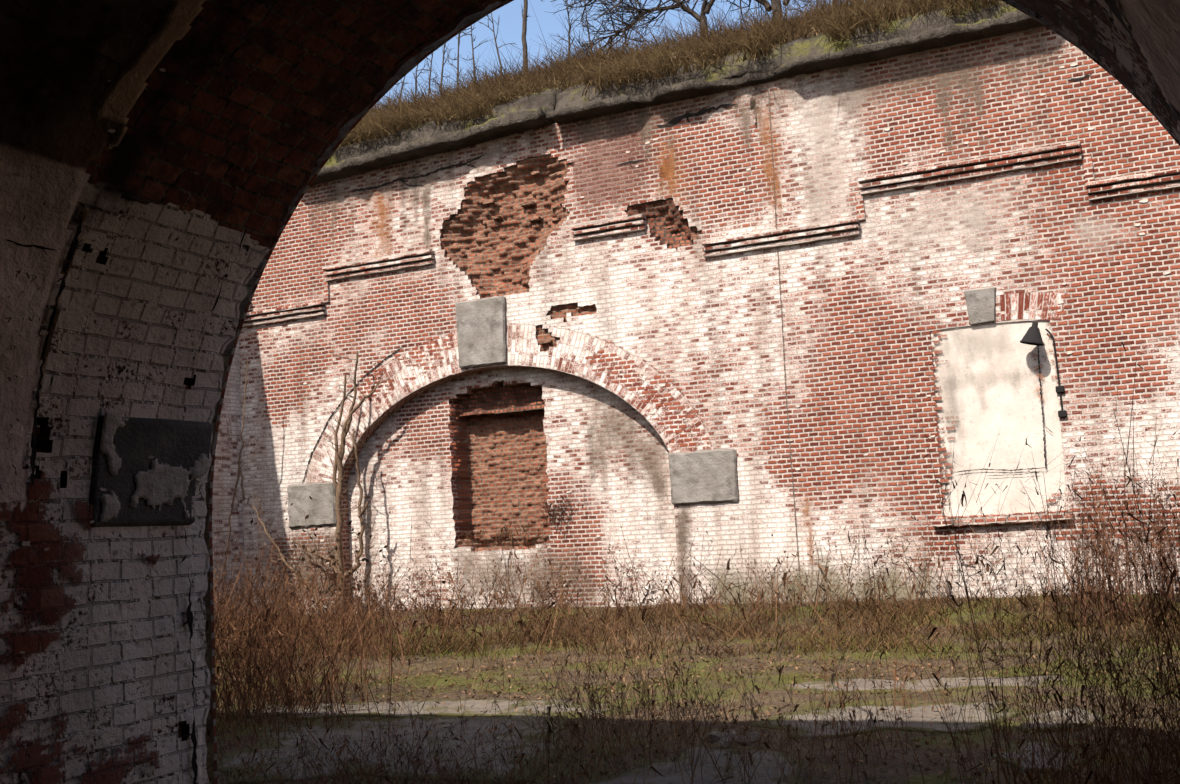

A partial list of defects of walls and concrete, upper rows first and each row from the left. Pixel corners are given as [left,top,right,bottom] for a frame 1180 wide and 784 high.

crack [657,104,737,128]
peeling [0,207,212,680]
spalling [253,97,787,471]
crack [767,87,802,601]
peeling [759,270,970,564]
peeling [0,698,162,784]
spalling [178,720,189,742]
crack [179,529,198,784]